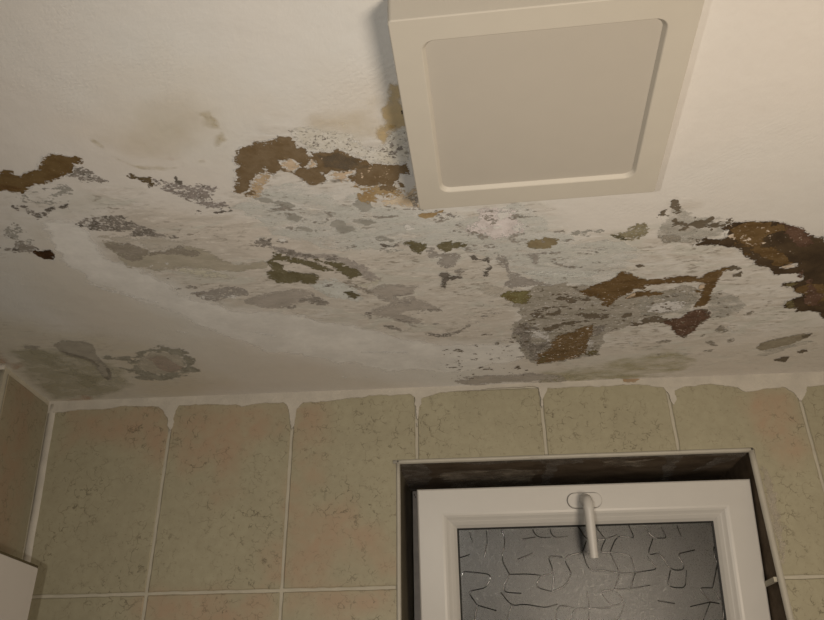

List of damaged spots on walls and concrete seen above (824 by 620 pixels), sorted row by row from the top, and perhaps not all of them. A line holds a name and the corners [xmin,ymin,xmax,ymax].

damp [377,84,405,142]
flaking render [4,223,56,261]
peeling [0,153,109,220]
peeling [75,215,179,239]
peeling [127,173,233,214]
peeling [175,238,383,309]
peeling [232,126,559,287]
peeling [571,223,650,241]
peeling [657,199,824,319]
peeling [500,264,743,366]
damp [16,345,200,396]